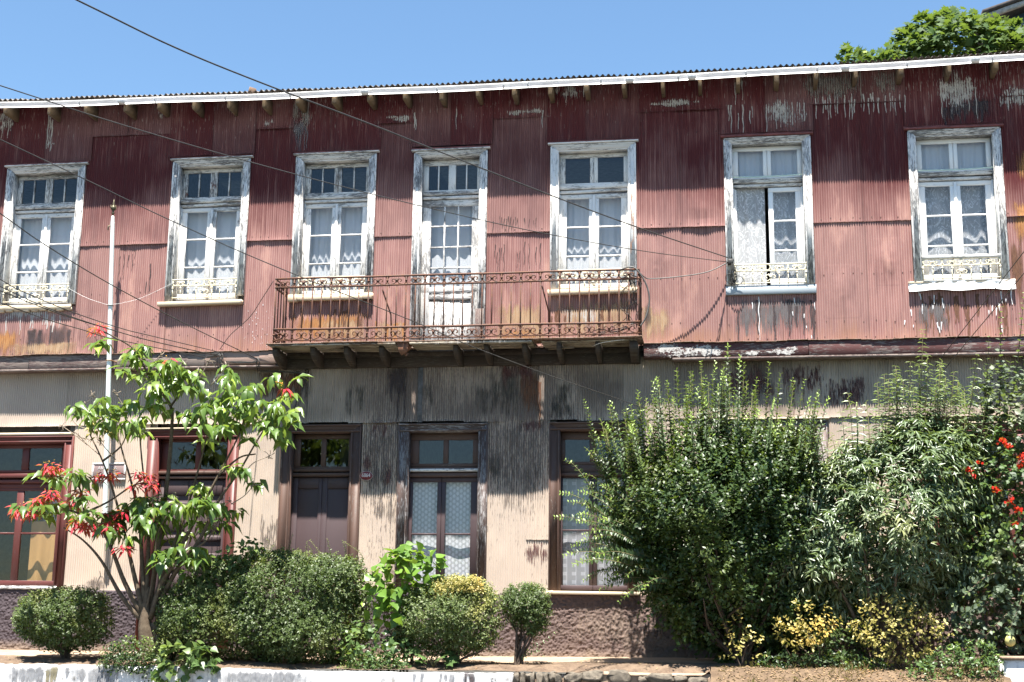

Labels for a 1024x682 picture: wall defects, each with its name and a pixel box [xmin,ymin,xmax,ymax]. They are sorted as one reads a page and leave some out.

peeling [728,70,906,133]
peeling [939,69,978,118]
peeling [998,86,1024,111]
rust [498,301,626,338]
peeling [656,343,723,358]